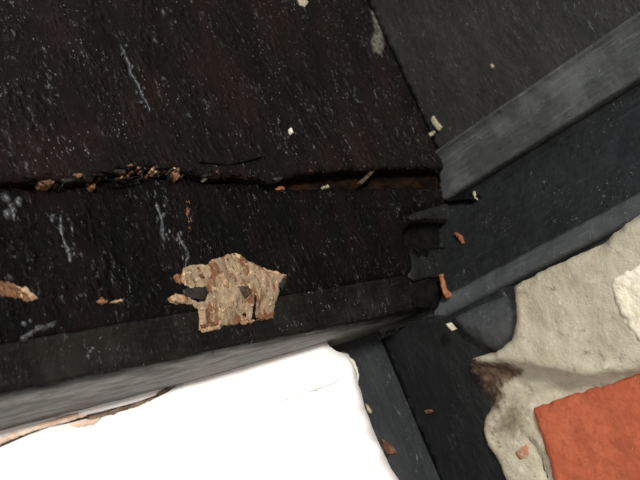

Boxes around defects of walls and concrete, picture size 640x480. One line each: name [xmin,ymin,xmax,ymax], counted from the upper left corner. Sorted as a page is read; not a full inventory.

crack [23,156,440,192]
peeling [0,281,39,302]
peeling [168,253,288,333]